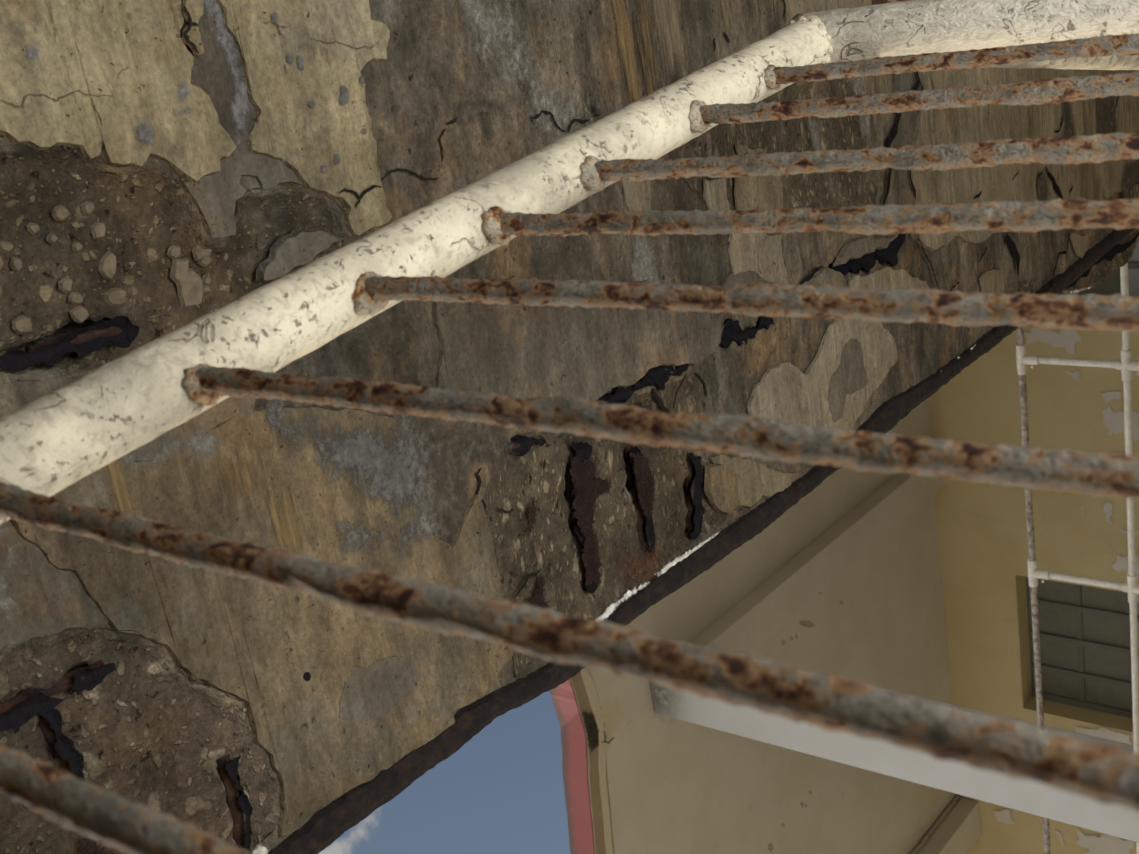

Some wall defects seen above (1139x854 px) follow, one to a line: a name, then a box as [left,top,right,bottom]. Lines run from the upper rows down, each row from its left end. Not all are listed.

spalling [0,0,393,384]
crack [339,117,457,208]
crack [530,105,599,133]
flaking render [682,159,1139,211]
flaking render [685,95,1139,158]
flaking render [431,301,774,415]
flaking render [747,318,898,430]
rust [630,452,655,519]
spalling [485,430,802,619]
rust [526,576,550,608]
spalling [0,520,280,854]
rust [81,837,114,854]